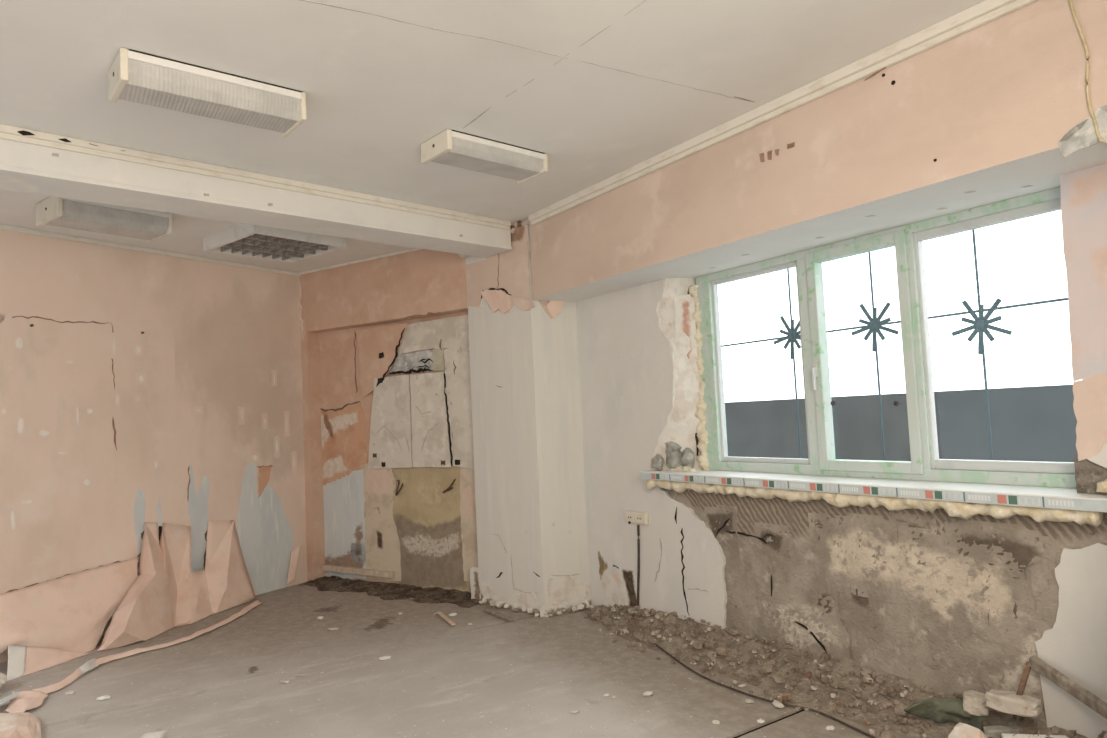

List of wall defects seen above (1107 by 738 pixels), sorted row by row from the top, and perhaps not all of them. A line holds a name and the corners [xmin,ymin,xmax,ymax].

flaking render [1058,105,1107,158]
crack [12,316,114,332]
flaking render [651,278,702,471]
crack [110,419,118,450]
peeling [321,407,362,485]
flaking render [392,466,461,517]
flaking render [1073,453,1107,495]
flaking render [663,488,1107,641]
flaking render [838,592,1047,738]